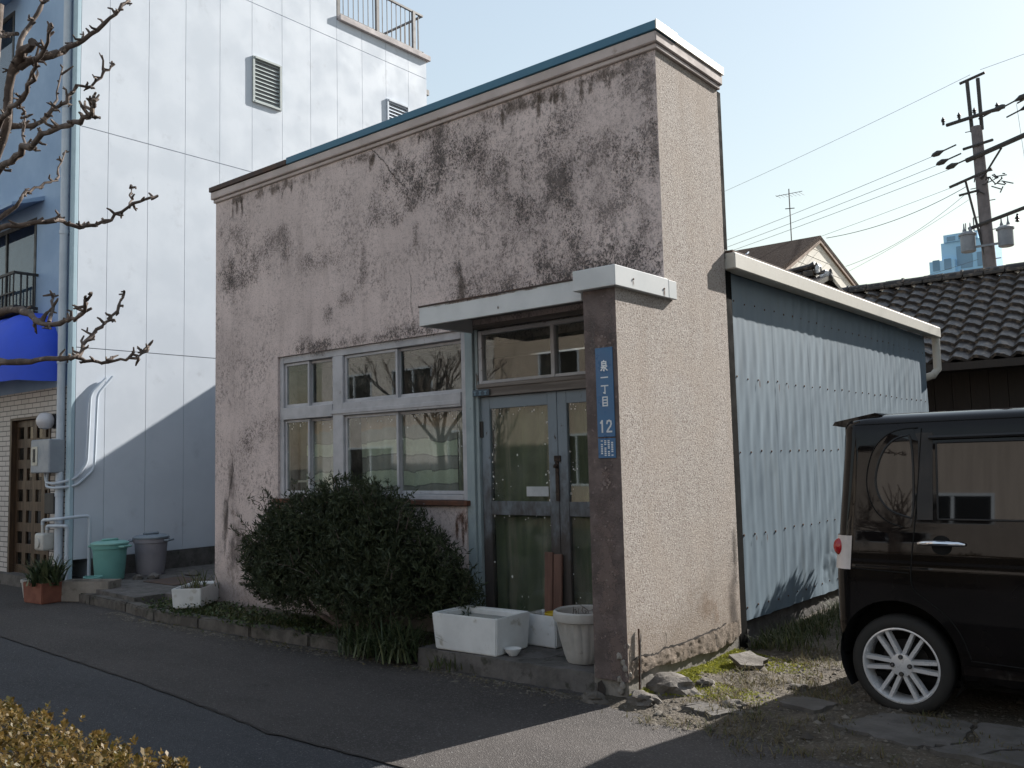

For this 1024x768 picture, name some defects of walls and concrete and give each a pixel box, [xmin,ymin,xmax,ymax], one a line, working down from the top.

damp [351,53,661,299]
damp [217,196,290,292]
damp [296,322,434,355]
damp [224,501,241,569]